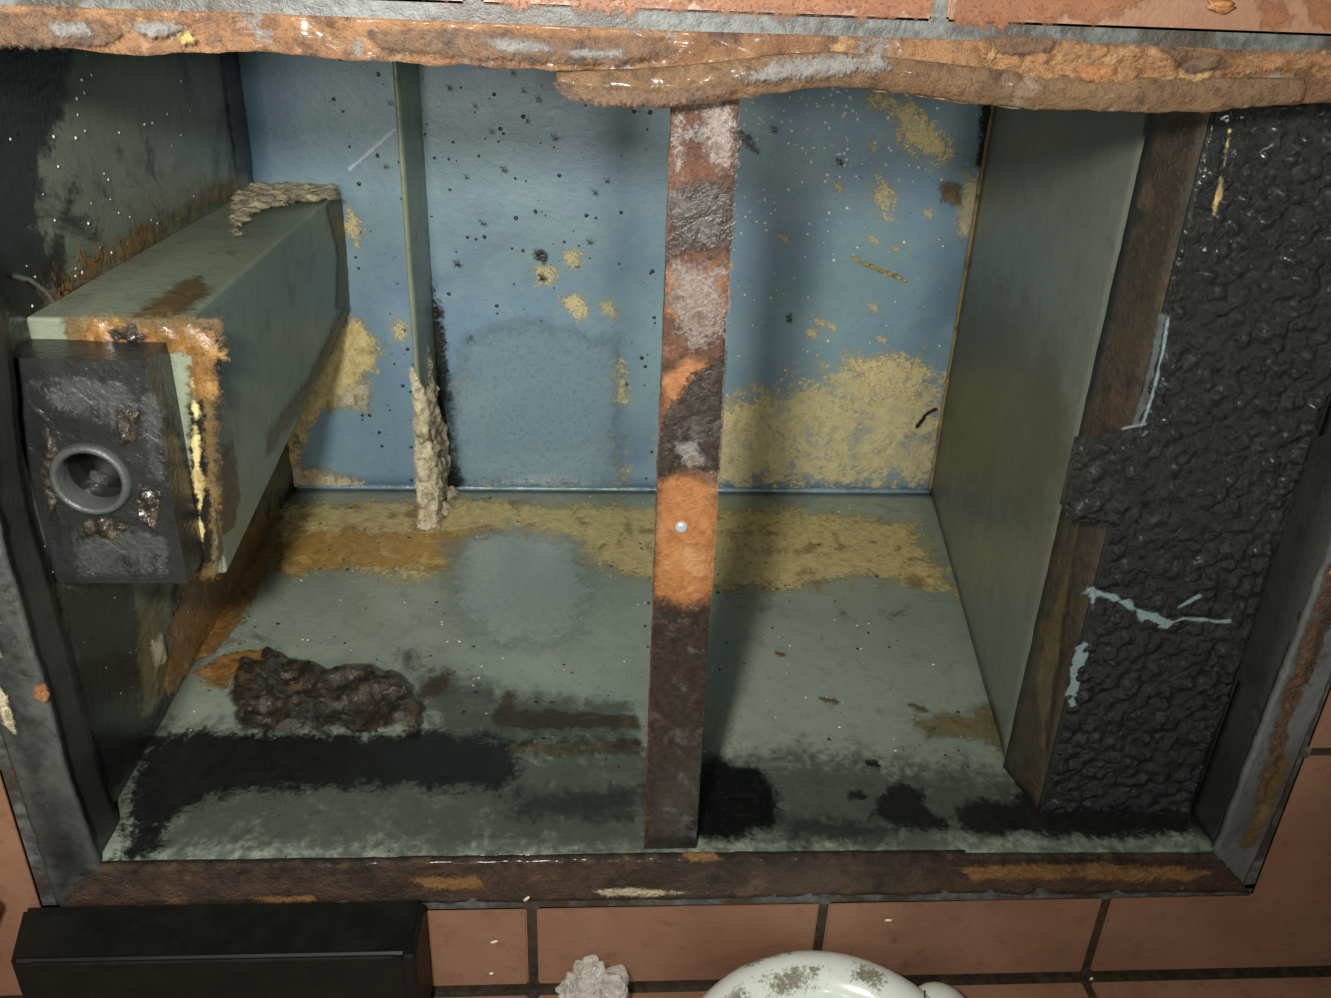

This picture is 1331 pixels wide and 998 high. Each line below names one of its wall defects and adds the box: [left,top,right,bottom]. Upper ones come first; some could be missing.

rust [366,27,686,68]
rust [973,34,1331,91]
rust [670,102,742,177]
water stain [667,178,737,256]
rust [662,254,732,412]
water stain [261,287,655,588]
water stain [652,334,947,489]
rust [654,436,718,606]
water stain [712,504,960,601]
water stain [55,583,783,864]
water stain [849,783,1199,841]
rust [594,887,684,898]